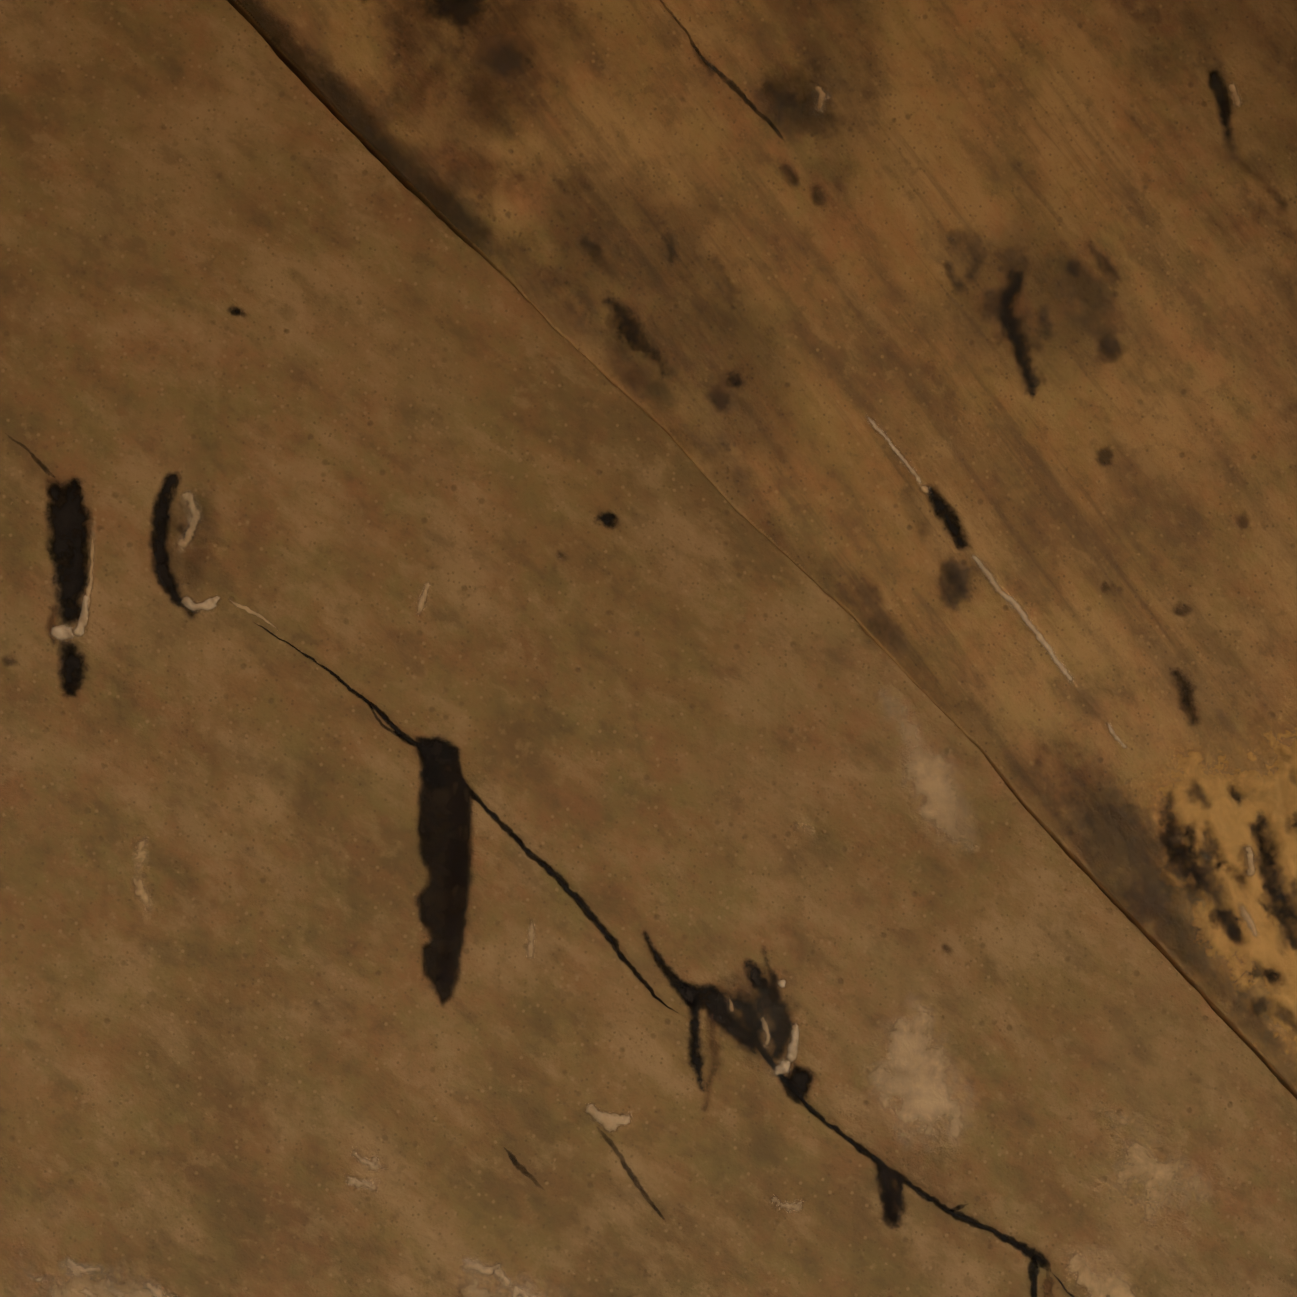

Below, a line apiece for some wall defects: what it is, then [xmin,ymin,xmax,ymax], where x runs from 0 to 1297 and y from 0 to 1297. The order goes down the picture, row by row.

crack [660,0,820,200]
crack [17,442,50,473]
spalling [46,478,94,696]
crack [257,624,418,748]
crack [462,778,678,1013]
peeling [1160,728,1297,1053]
spalling [644,932,813,1110]